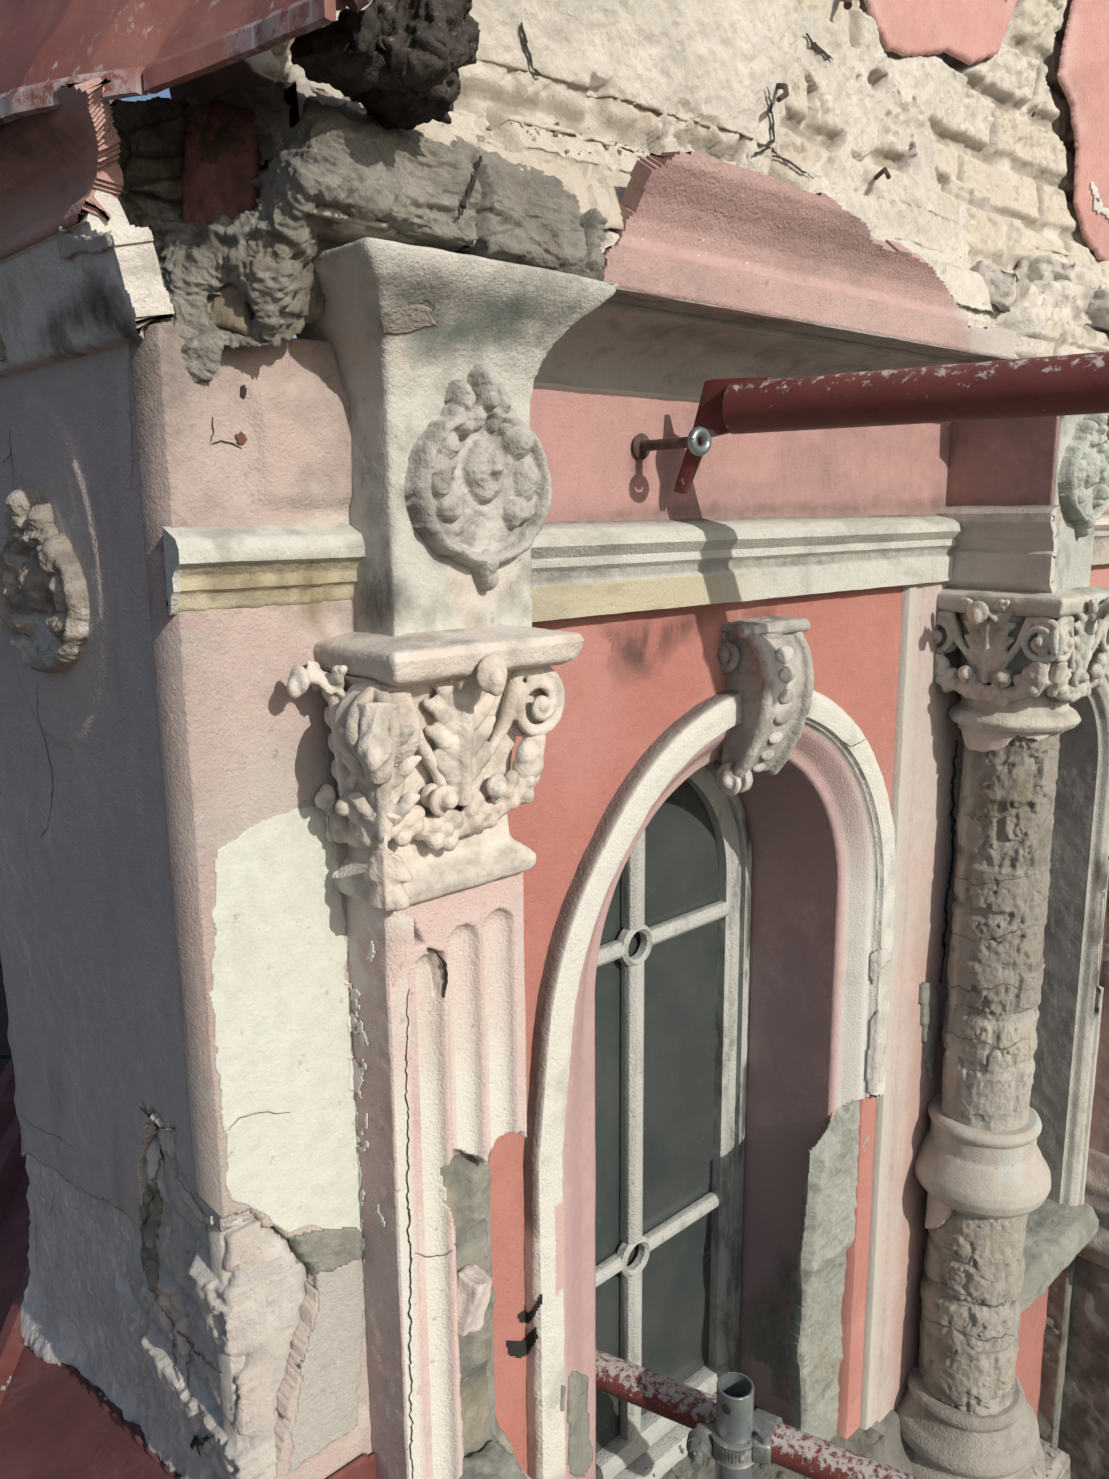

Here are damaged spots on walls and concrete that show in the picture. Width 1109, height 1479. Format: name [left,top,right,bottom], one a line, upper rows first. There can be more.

peeling [1090,182,1109,219]
spalling [869,948,892,984]
crack [942,1028,1026,1050]
crack [940,739,1036,993]
crack [139,1100,222,1398]
spalling [21,1111,365,1479]
spalling [440,1150,527,1479]
spalling [560,1371,593,1478]
spalling [786,1010,888,1442]